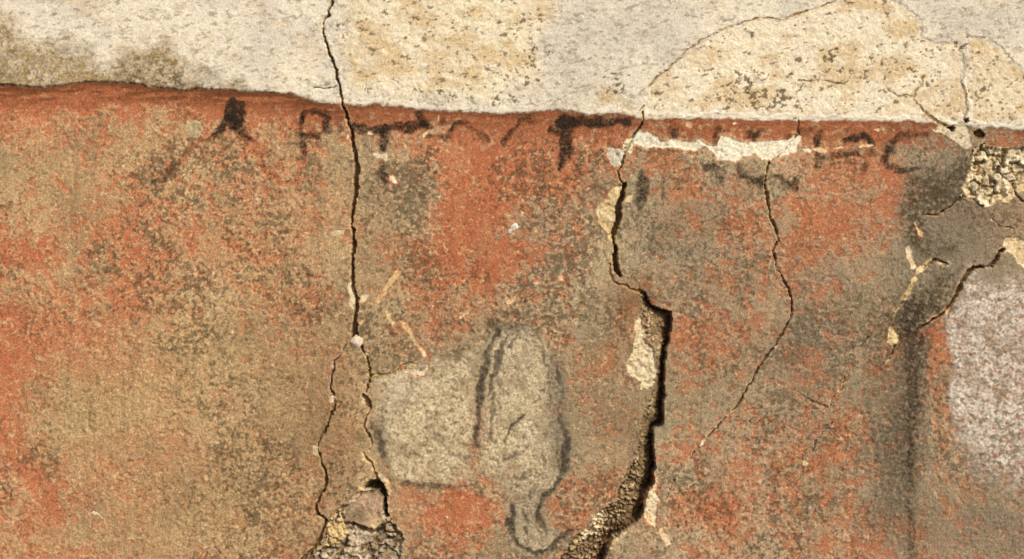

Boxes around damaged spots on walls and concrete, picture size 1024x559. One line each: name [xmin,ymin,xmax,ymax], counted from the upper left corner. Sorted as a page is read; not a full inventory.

flaking render [585,0,1024,209]
crack [798,78,849,86]
crack [886,64,970,128]
crack [302,0,419,559]
crack [560,0,837,559]
crack [793,182,1024,468]
flaking render [308,472,406,559]